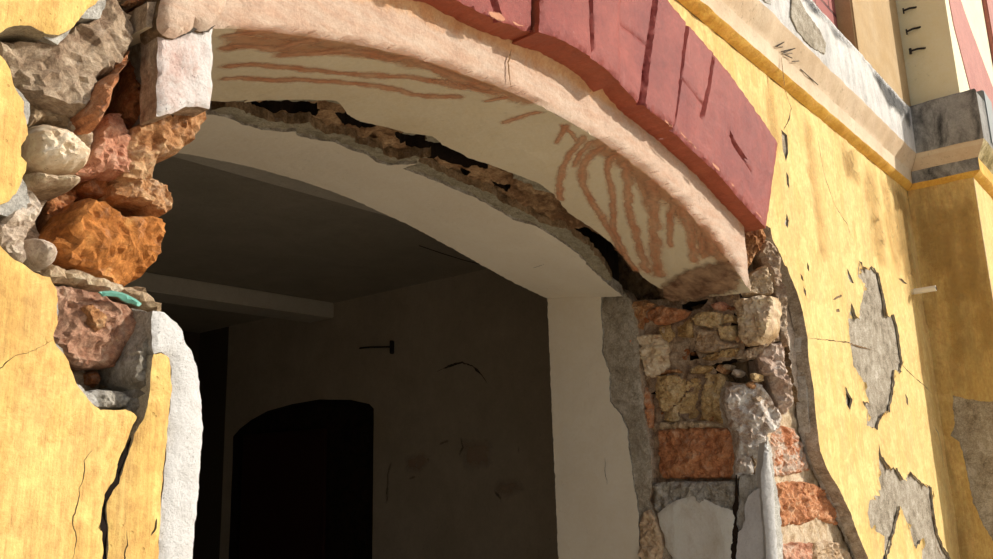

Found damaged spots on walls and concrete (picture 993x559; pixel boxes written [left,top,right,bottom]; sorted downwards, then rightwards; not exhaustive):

peeling [489,11,523,26]
spalling [0,0,207,413]
spalling [629,229,838,559]
peeling [833,262,908,429]
crack [100,438,131,559]
spalling [783,540,851,559]
peeling [868,456,948,559]
peeling [951,395,993,540]